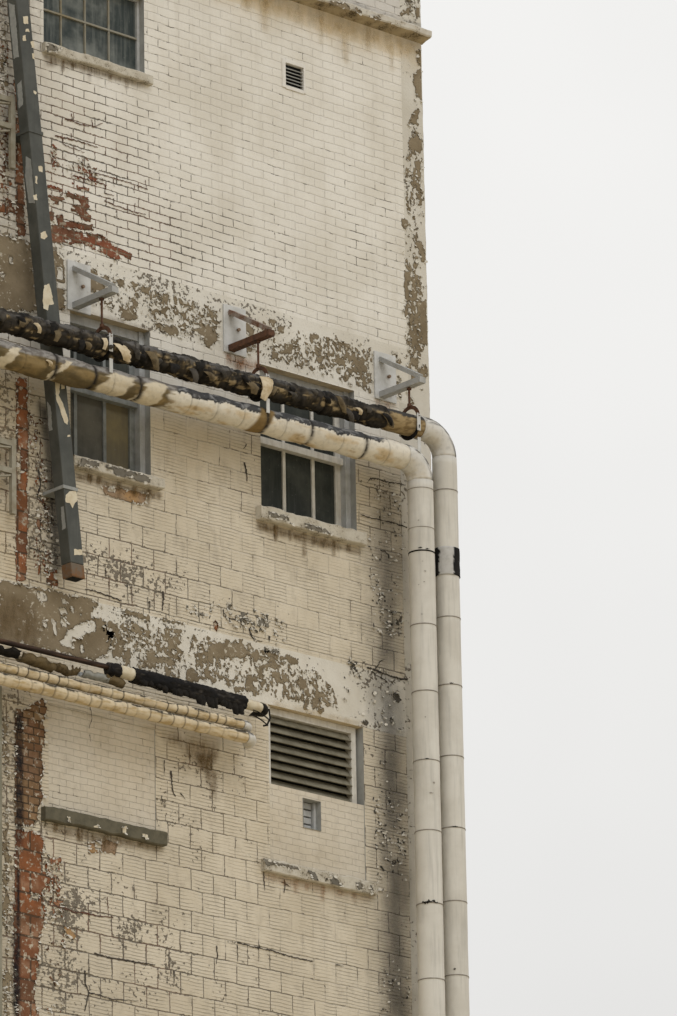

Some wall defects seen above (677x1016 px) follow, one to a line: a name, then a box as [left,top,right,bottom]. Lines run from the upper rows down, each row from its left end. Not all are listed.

peeling [0,0,221,348]
peeling [246,319,374,394]
peeling [330,0,420,24]
peeling [392,49,428,406]
peeling [0,377,405,732]
flaking render [2,698,76,1016]